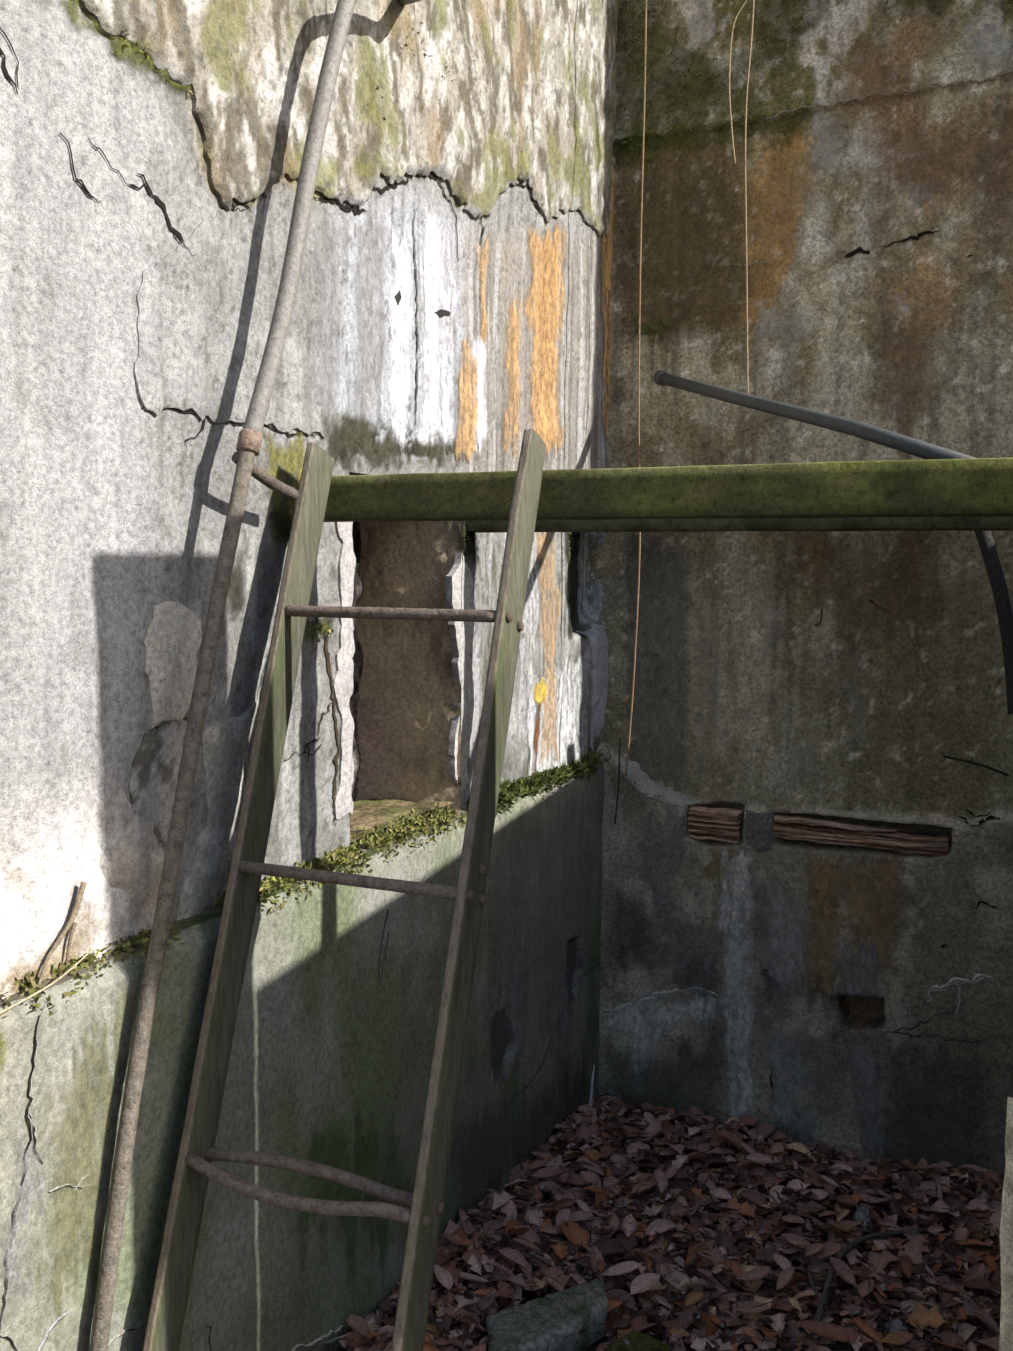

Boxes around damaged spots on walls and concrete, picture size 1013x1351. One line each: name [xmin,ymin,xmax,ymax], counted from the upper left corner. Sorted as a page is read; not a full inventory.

crack [60,133,197,258]
peeling [77,0,338,423]
peeling [264,0,619,439]
corrosion [456,239,488,461]
corrosion [505,226,565,457]
crack [845,230,941,257]
spalling [490,1011,515,1081]
water stain [5,1149,44,1294]
crack [0,1015,91,1351]